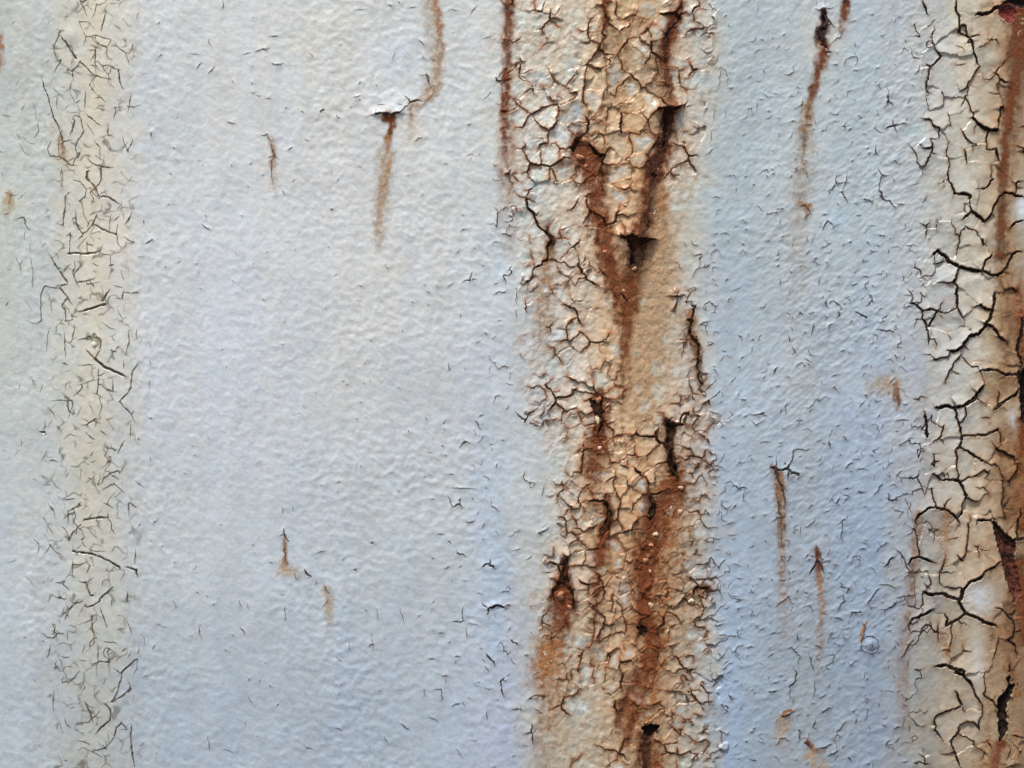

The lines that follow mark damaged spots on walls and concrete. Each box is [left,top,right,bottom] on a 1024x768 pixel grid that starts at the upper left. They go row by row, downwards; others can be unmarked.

rust [376,111,396,235]
rust [409,0,445,116]
rust [500,0,514,175]
rust [570,0,685,405]
rust [799,0,850,174]
rust [994,6,1024,373]
crack [0,0,199,767]
crack [369,0,1024,768]
rust [531,557,578,730]
rust [581,388,615,632]
rust [614,417,712,768]
rust [771,465,786,577]